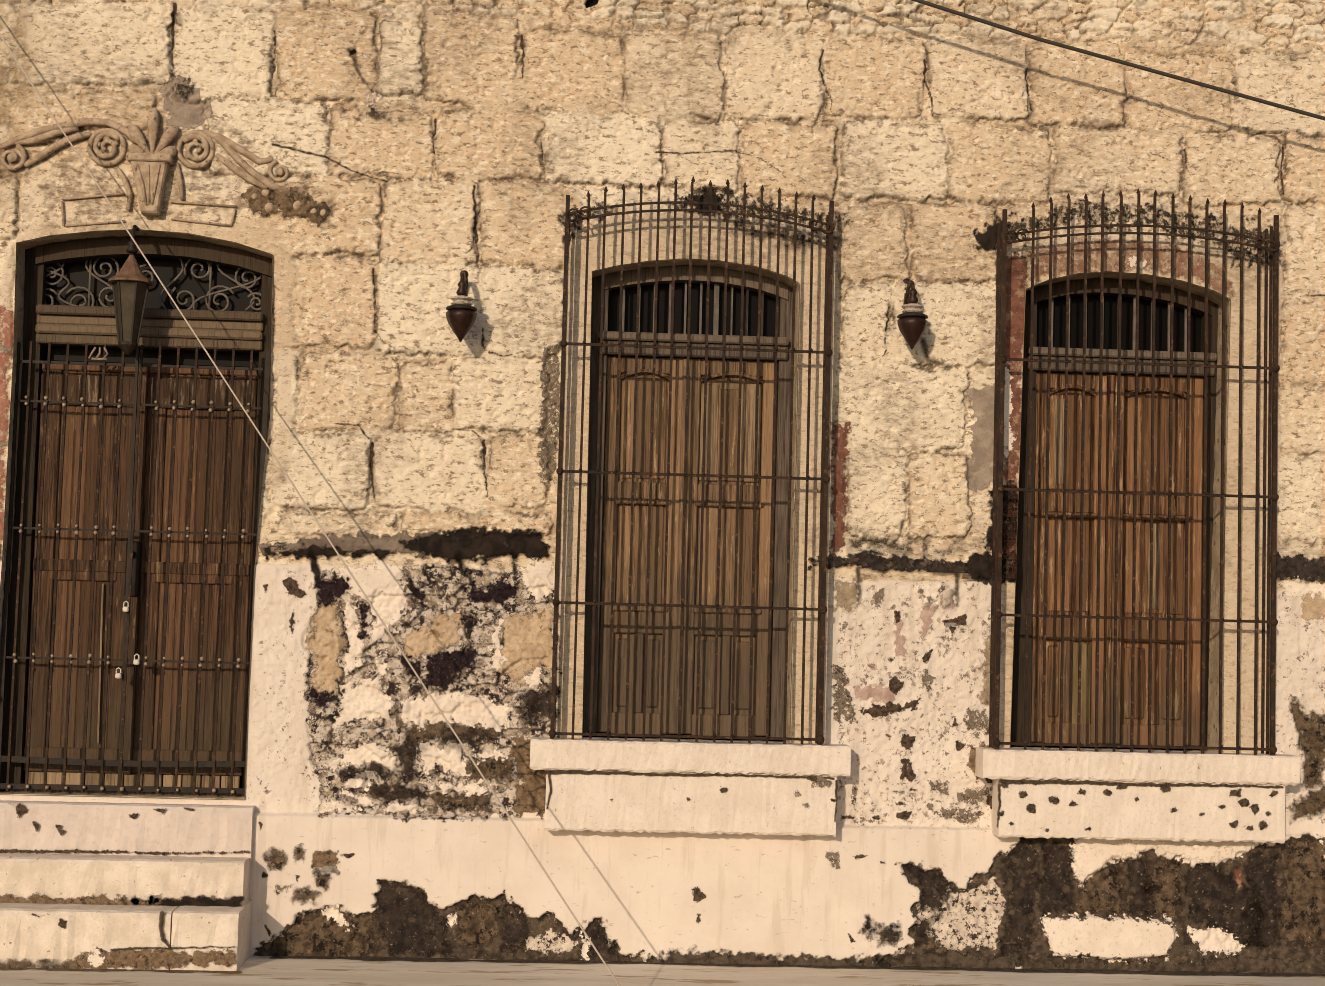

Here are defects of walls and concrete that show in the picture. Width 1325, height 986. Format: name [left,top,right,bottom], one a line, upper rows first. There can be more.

peeling [0,305,14,540]
flaking render [263,558,563,823]
peeling [832,579,884,612]
peeling [830,586,967,724]
spalling [1281,576,1325,623]
peeling [10,803,39,832]
spalling [795,775,858,819]
spalling [825,633,1325,974]
spalling [0,947,236,970]
spalling [0,824,651,962]